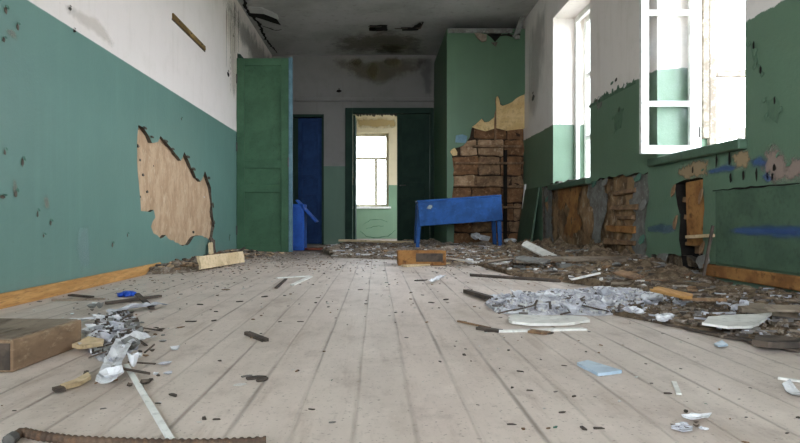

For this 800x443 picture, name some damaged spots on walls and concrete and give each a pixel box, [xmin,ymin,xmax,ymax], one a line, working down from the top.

crack [243,0,282,53]
flaking render [137,126,215,245]
flaking render [450,91,534,243]
flaking render [544,173,649,258]
spalling [656,154,718,272]
peeling [728,143,800,183]